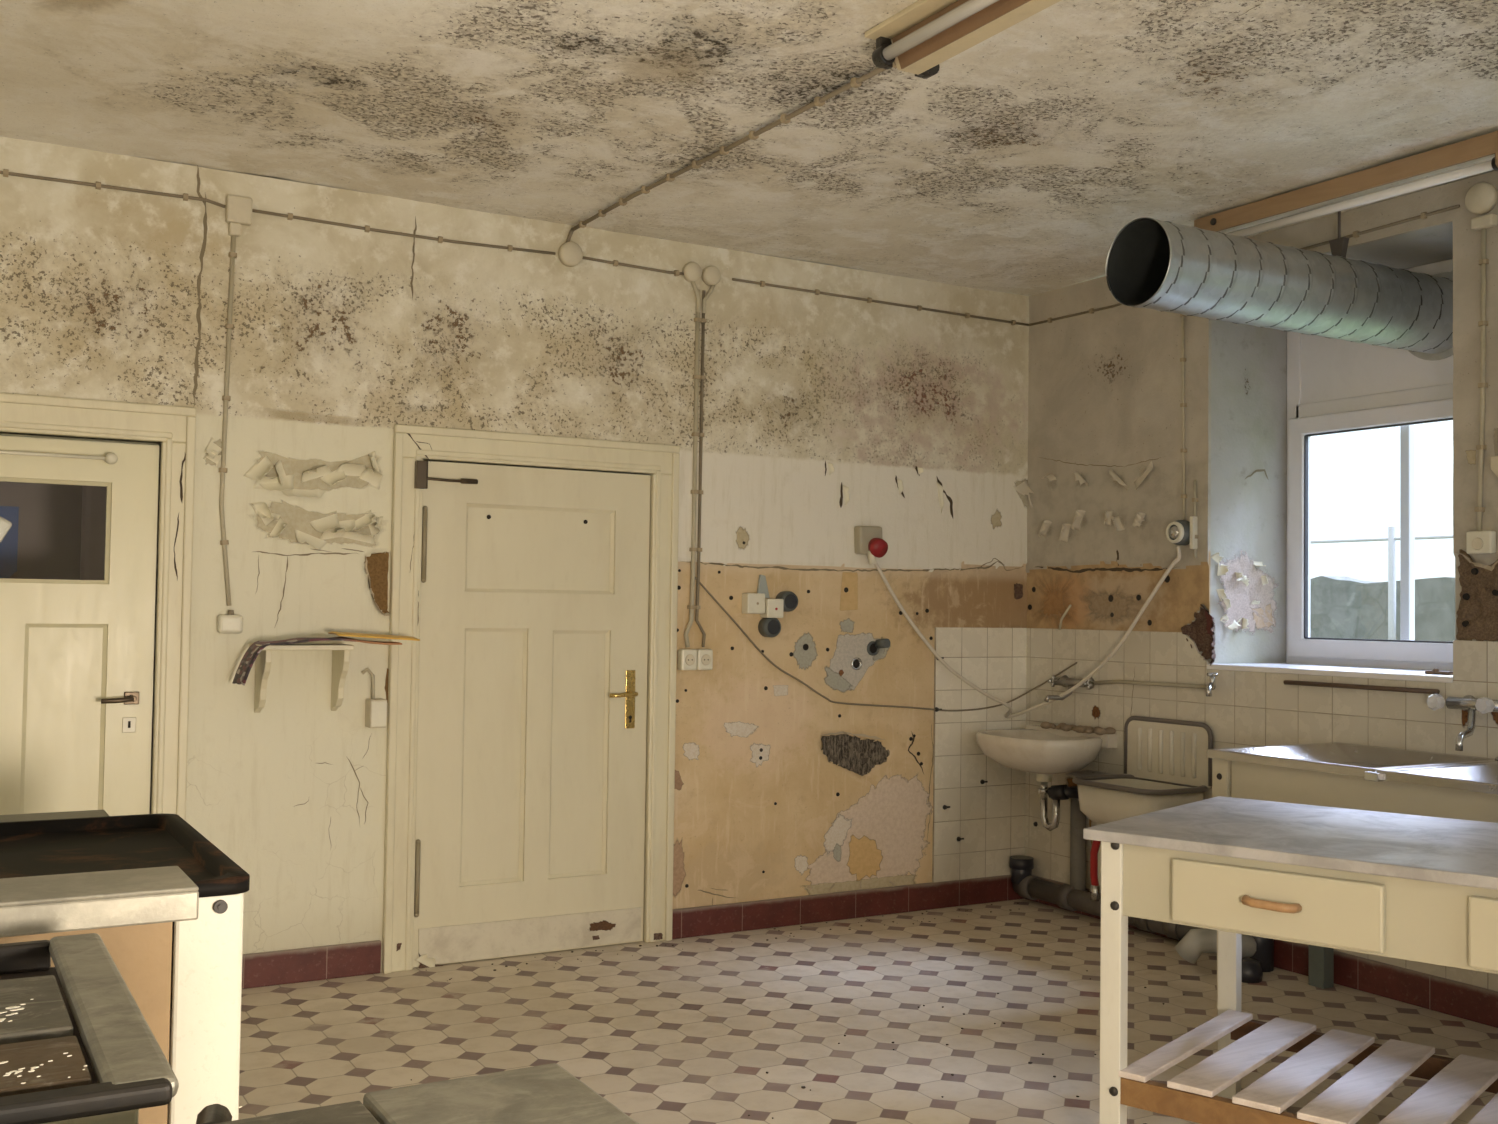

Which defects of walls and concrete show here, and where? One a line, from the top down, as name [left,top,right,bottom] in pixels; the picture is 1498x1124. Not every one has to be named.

leakage [550,15,763,68]
leakage [84,277,156,342]
crack [193,168,208,406]
leakage [288,271,369,369]
leakage [421,299,493,376]
leakage [596,325,654,396]
peeling [243,451,390,616]
spalling [851,641,879,670]
peeling [1181,550,1278,666]
flaking render [1455,549,1498,641]
crack [296,736,371,850]
peeling [795,714,933,895]